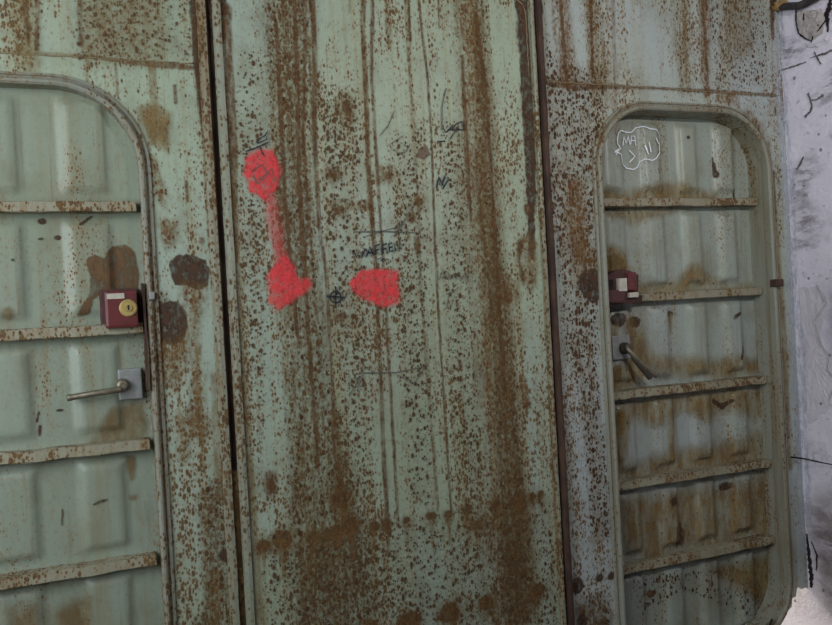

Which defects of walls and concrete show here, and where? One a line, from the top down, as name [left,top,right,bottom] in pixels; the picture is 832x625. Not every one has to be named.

corrosion [11,0,39,71]
corrosion [76,0,202,124]
flaking render [795,0,832,48]
corrosion [140,105,169,146]
corrosion [160,219,177,248]
corrosion [78,245,138,316]
corrosion [198,0,559,625]
corrosion [159,254,218,466]
corrosion [779,293,791,438]
corrosion [620,478,767,559]
corrosion [573,572,614,625]
corrosion [626,556,768,616]